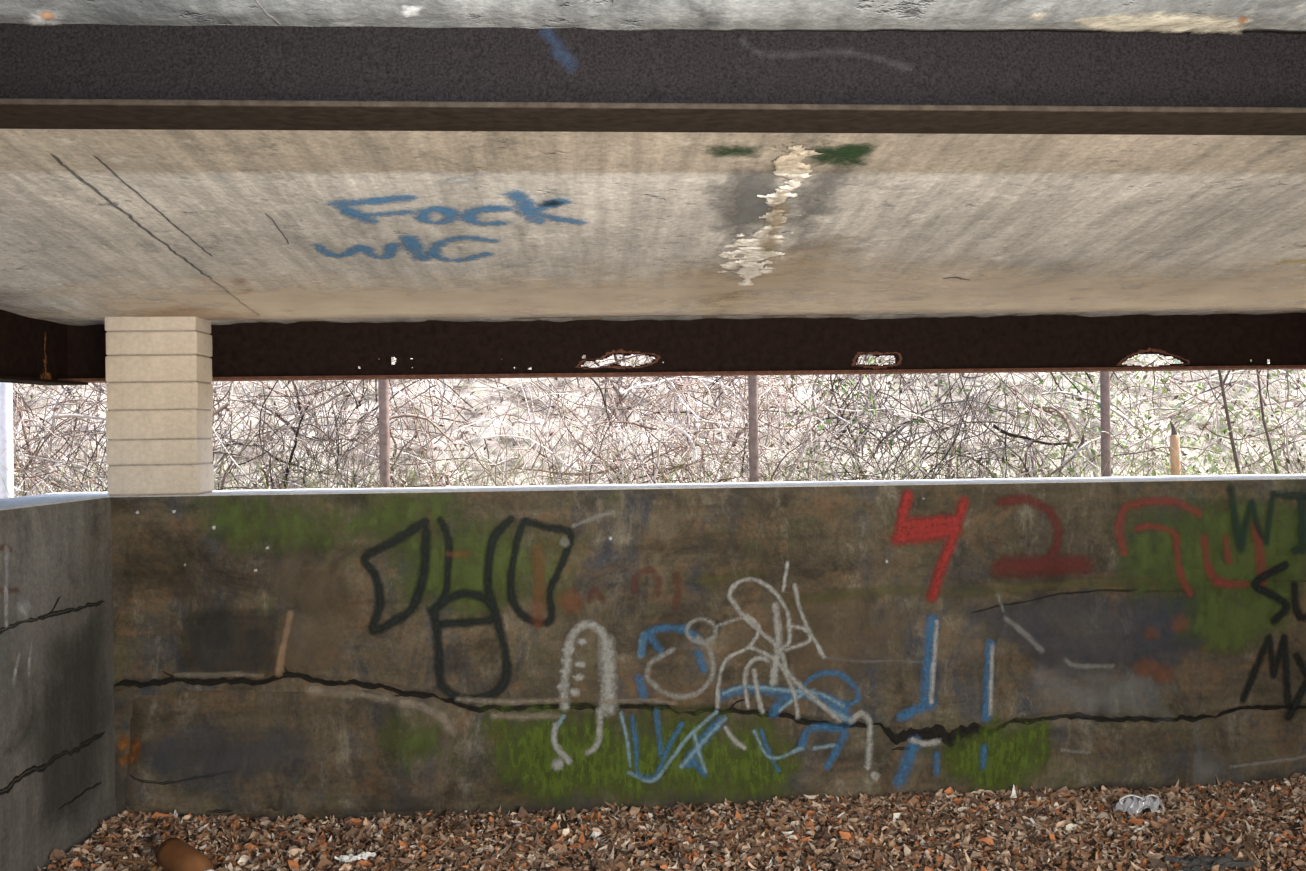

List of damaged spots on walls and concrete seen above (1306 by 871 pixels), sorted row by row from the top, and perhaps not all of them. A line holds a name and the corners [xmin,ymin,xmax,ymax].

crack [51,154,260,316]
leakage [704,145,848,306]
crack [0,596,105,635]
crack [114,645,1306,750]
crack [0,732,105,795]
crack [57,771,232,811]
crack [206,807,233,815]